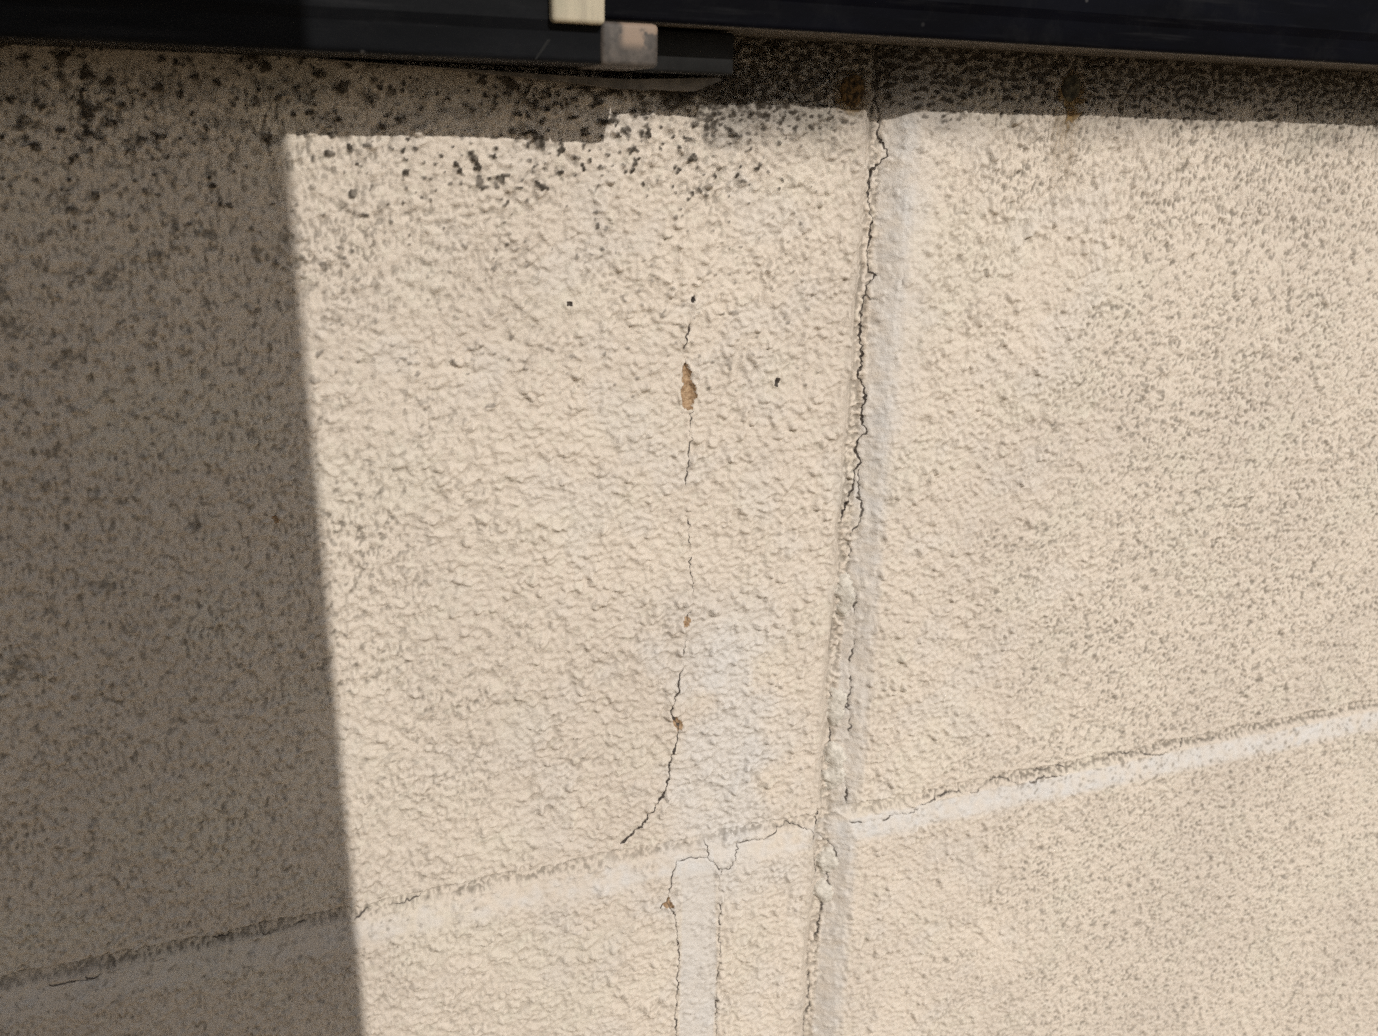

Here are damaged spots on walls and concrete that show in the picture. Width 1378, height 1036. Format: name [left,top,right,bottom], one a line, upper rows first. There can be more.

water stain [0,44,221,230]
water stain [233,36,1378,206]
crack [840,50,888,558]
crack [685,412,693,482]
crack [621,521,694,844]
crack [660,595,1064,1036]
crack [1109,737,1214,756]
crack [46,958,163,987]
crack [354,895,420,920]